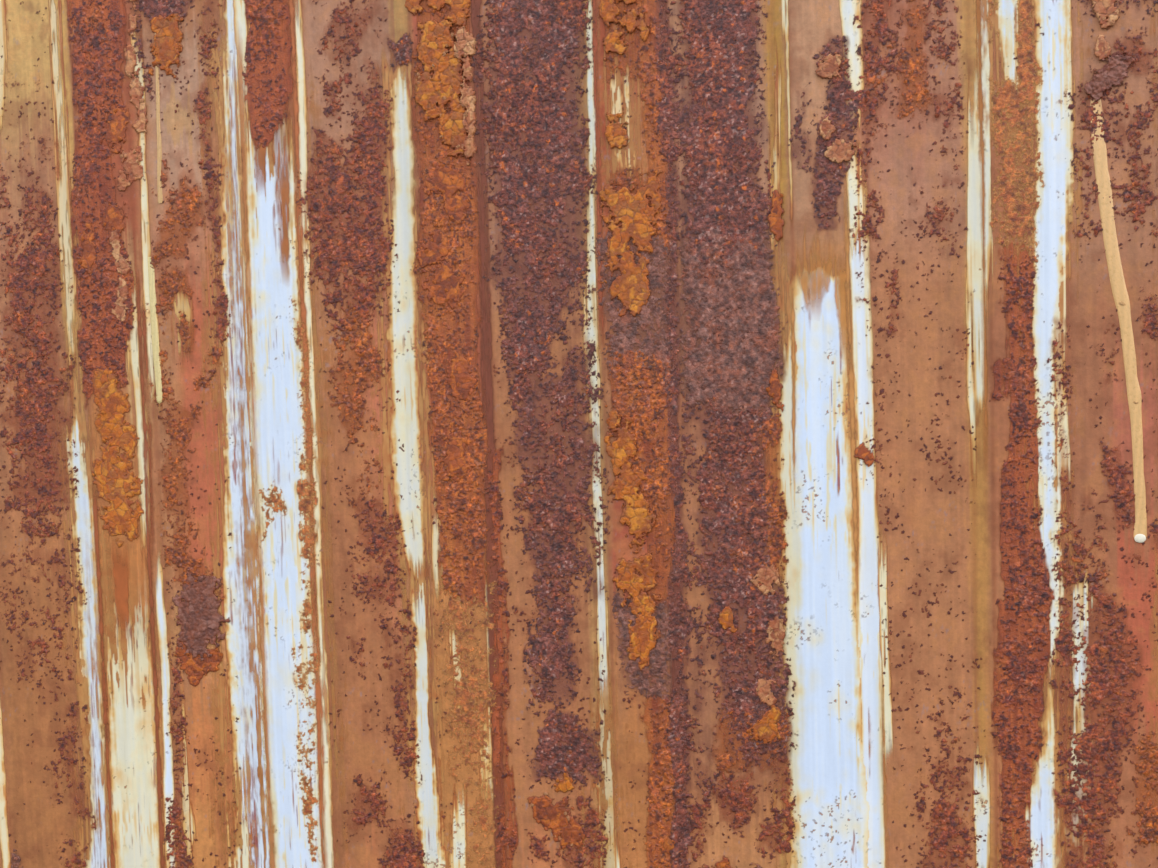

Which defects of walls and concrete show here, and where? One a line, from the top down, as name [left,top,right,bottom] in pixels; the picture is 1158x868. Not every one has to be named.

rust [0,0,275,868]
rust [236,0,1158,868]